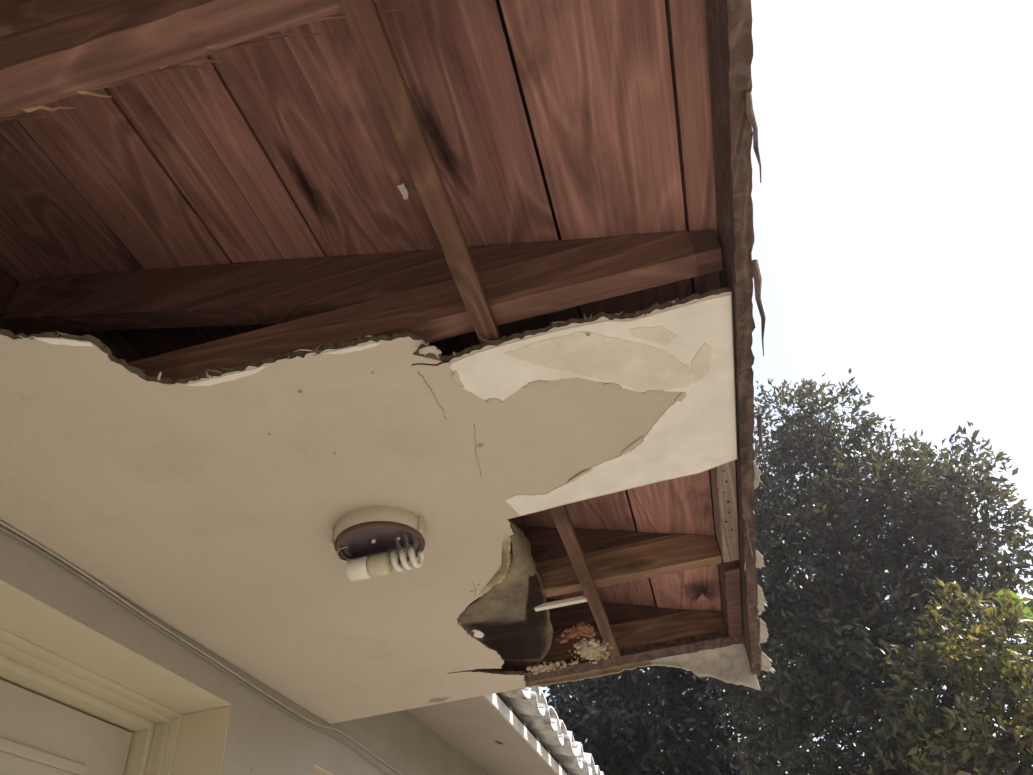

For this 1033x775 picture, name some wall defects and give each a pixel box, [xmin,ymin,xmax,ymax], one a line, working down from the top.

flaking render [34,337,93,346]
flaking render [322,342,382,354]
flaking render [183,365,266,386]
crack [411,343,450,419]
peeling [450,294,737,516]
peeling [753,461,762,489]
peeling [745,549,765,570]
flaking render [507,584,776,692]